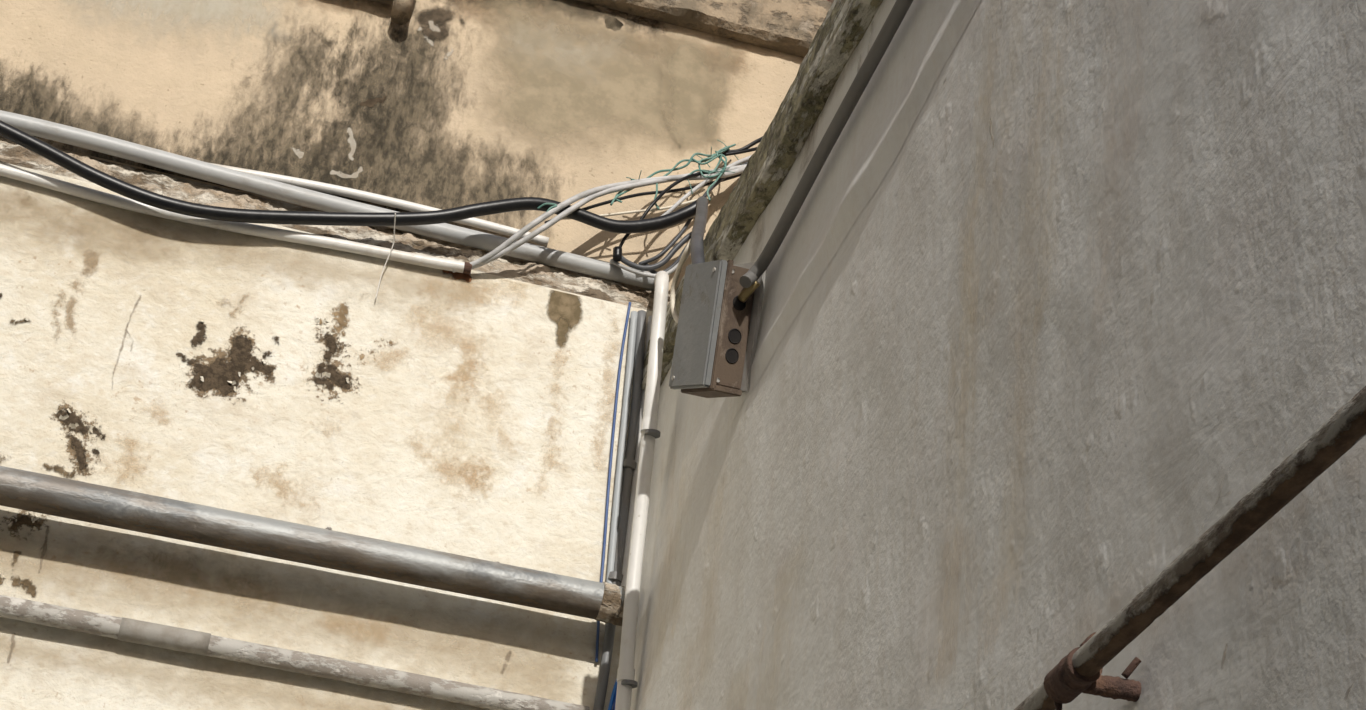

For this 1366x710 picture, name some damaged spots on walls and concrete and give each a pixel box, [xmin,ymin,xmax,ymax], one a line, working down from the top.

leakage [462,0,743,143]
leakage [0,23,553,225]
spalling [176,320,279,404]
spalling [307,302,359,404]
spalling [44,400,105,478]
spalling [0,510,48,597]